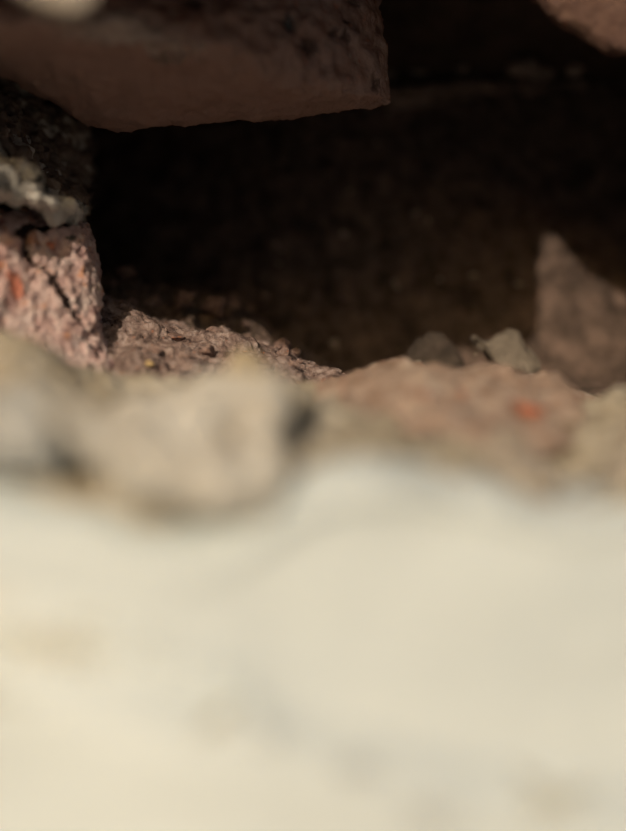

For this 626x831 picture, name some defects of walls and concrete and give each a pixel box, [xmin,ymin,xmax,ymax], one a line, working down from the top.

peeling [25,0,92,17]
crack [15,223,113,358]
flaking render [0,329,626,528]